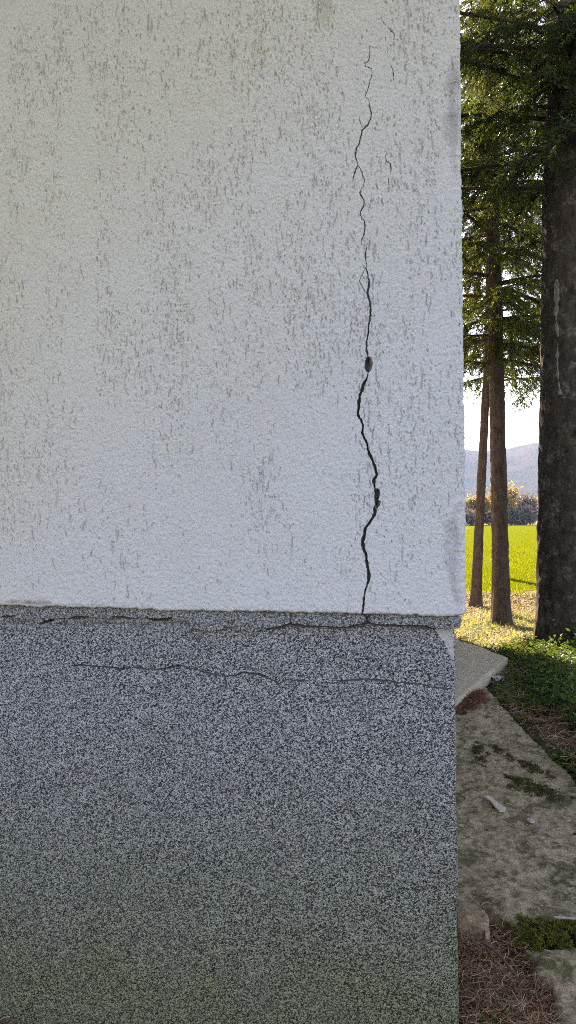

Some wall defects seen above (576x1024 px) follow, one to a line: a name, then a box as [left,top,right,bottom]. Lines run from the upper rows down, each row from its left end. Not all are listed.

crack [260,17,434,631]
crack [41,616,172,624]
crack [42,663,452,689]